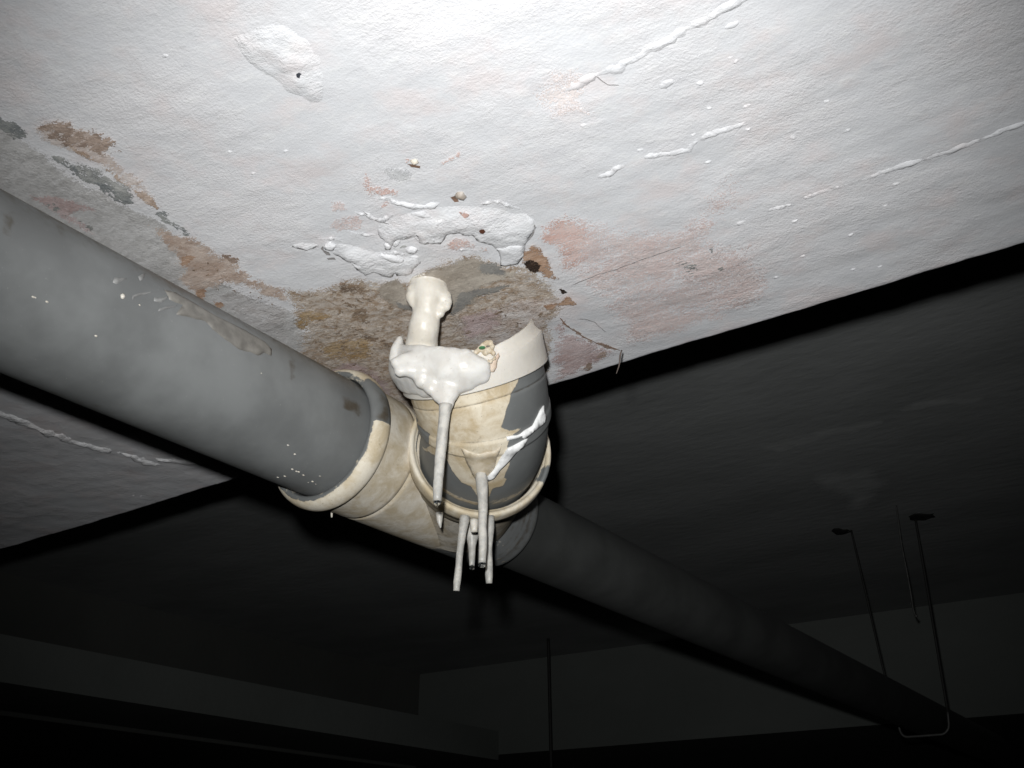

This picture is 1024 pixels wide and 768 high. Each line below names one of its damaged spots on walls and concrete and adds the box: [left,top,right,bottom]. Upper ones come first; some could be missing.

water stain [0,117,612,506]
peeling [292,191,536,277]